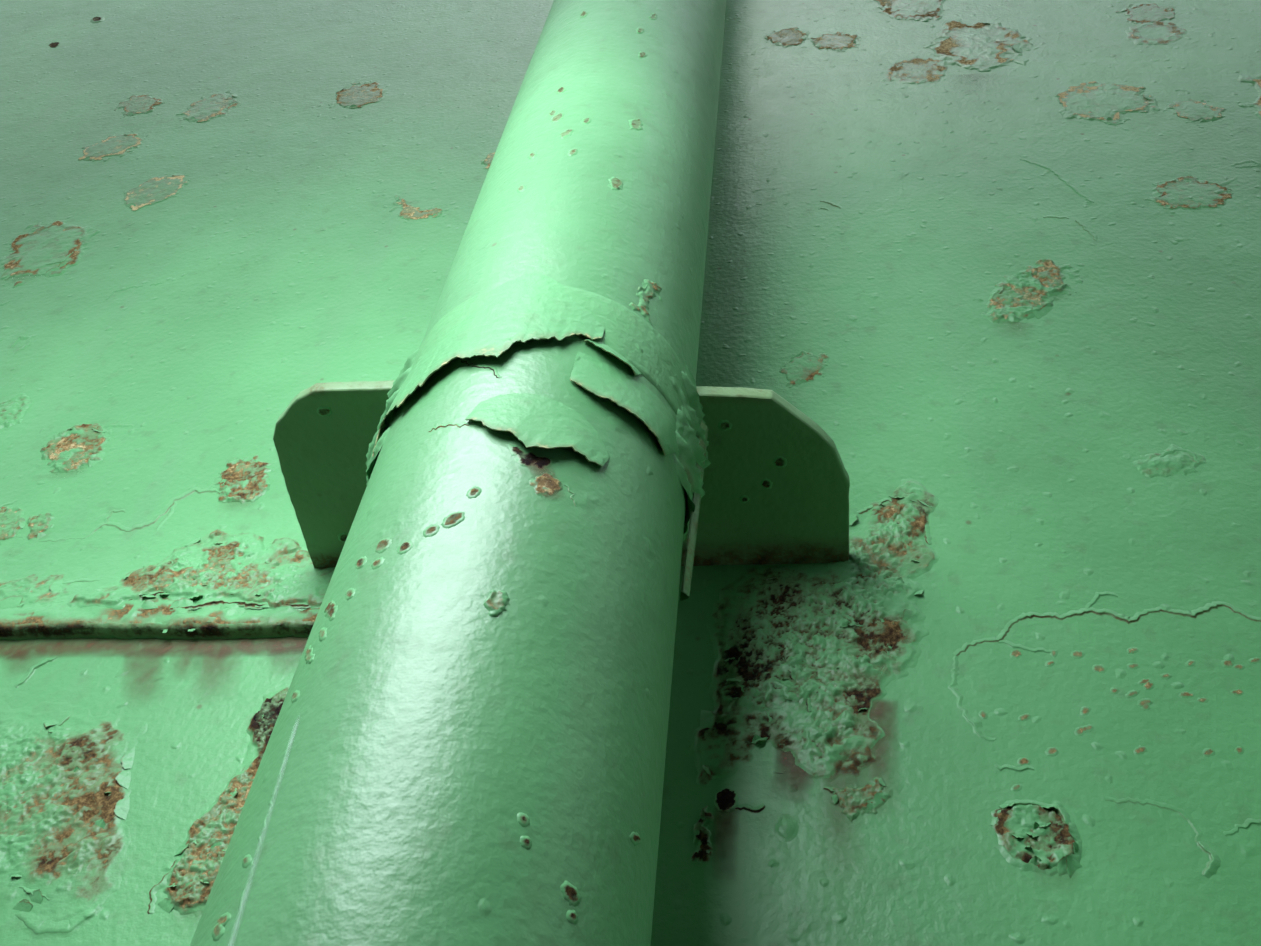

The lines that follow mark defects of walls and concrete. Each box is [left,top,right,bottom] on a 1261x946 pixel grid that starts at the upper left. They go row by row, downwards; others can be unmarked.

spalling [973,259,1083,323]
peeling [372,274,679,457]
spalling [40,423,133,475]
crack [16,487,221,542]
spalling [213,455,275,504]
hole [355,486,482,569]
peeling [428,393,610,471]
spalling [66,529,355,664]
spalling [686,479,939,823]
crack [948,591,1261,772]
spalling [147,687,300,917]
spalling [990,799,1083,878]